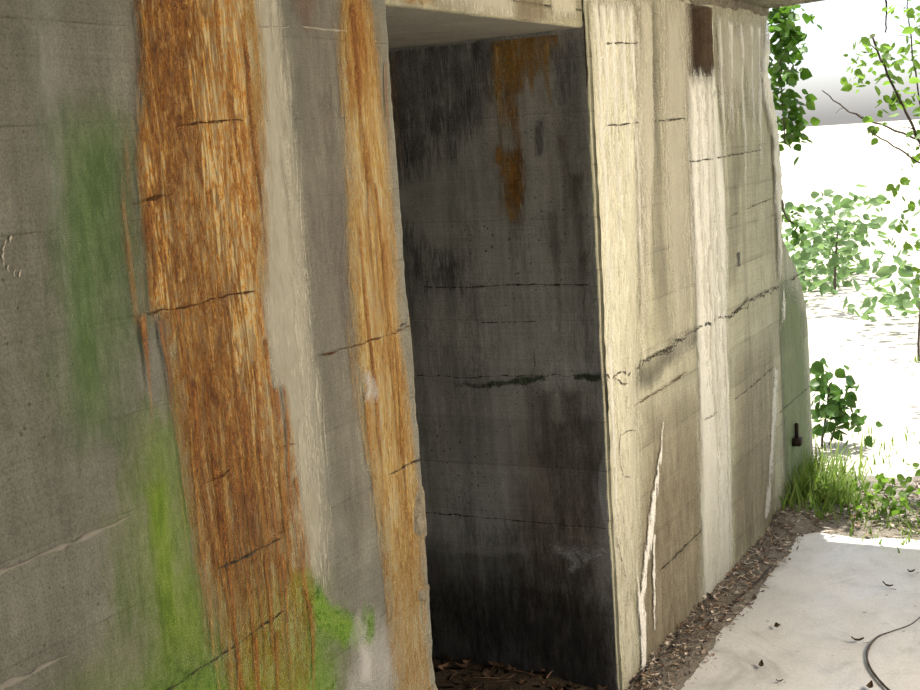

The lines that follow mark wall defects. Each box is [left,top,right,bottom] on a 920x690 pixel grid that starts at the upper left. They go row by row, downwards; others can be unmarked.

spalling [680,0,770,16]
rust [488,34,562,222]
rust [134,0,315,690]
water stain [241,0,331,591]
rust [339,0,430,690]
crack [417,271,804,388]
water stain [427,0,801,690]
crack [635,372,686,406]
water stain [360,644,371,684]